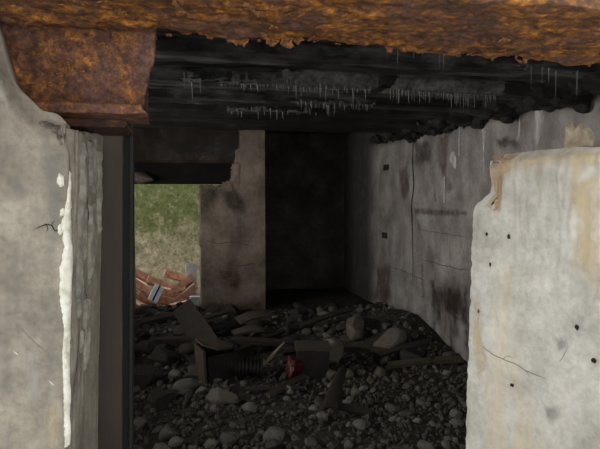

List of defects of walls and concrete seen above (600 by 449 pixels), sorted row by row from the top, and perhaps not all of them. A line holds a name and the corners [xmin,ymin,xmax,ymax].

corrosion [226,38,249,47]
corrosion [257,24,321,48]
spalling [369,63,600,144]
spalling [222,148,241,192]
crack [387,152,467,280]
water stain [57,171,73,447]
water stain [433,288,464,322]
crack [481,345,546,379]